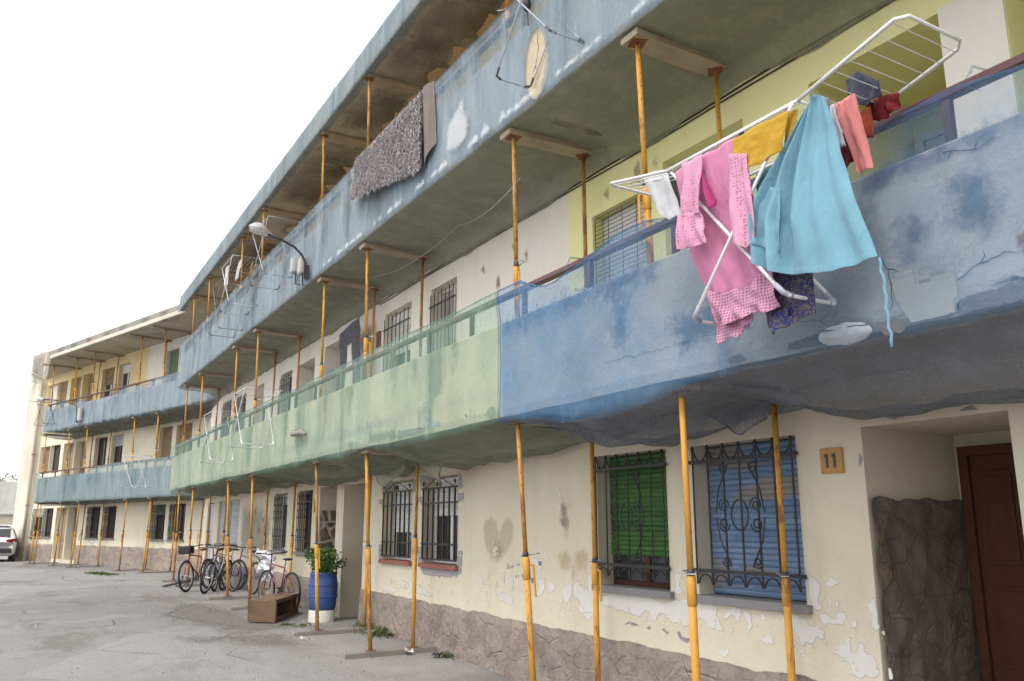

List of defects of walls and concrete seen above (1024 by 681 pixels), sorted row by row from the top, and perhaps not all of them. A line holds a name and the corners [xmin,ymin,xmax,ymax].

crack [943,129,995,160]
crack [876,251,899,310]
peeling [531,552,773,645]
peeling [781,574,893,679]